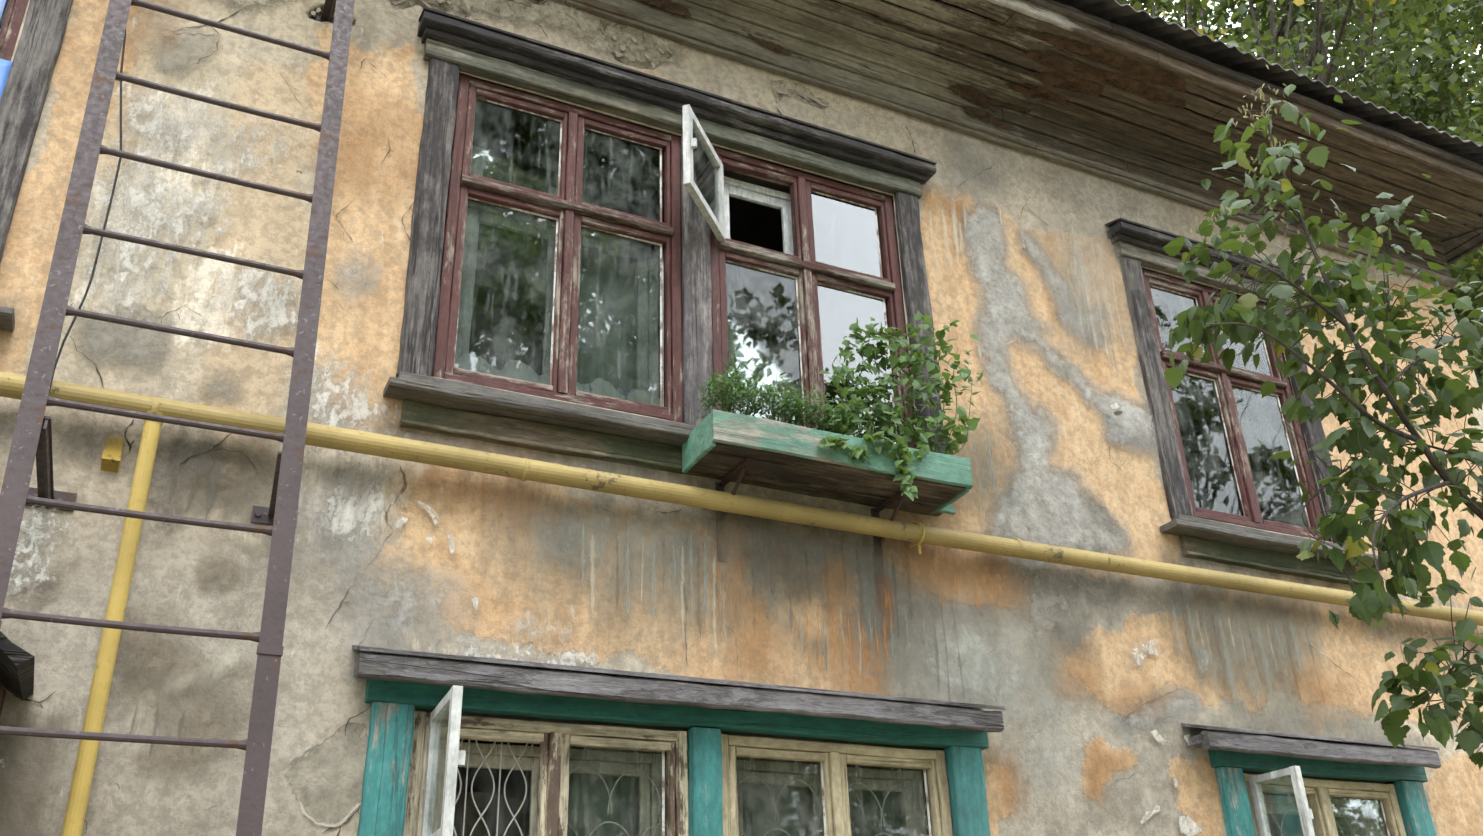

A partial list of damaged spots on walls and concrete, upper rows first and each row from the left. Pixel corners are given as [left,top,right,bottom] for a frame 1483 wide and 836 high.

spalling [389,0,683,70]
peeling [963,203,1155,590]
crack [326,466,407,645]
water stain [412,492,708,673]
water stain [752,526,965,706]
peeling [1132,639,1160,670]
peeling [1151,729,1197,750]
peeling [1140,805,1160,824]
peeling [1179,815,1202,836]